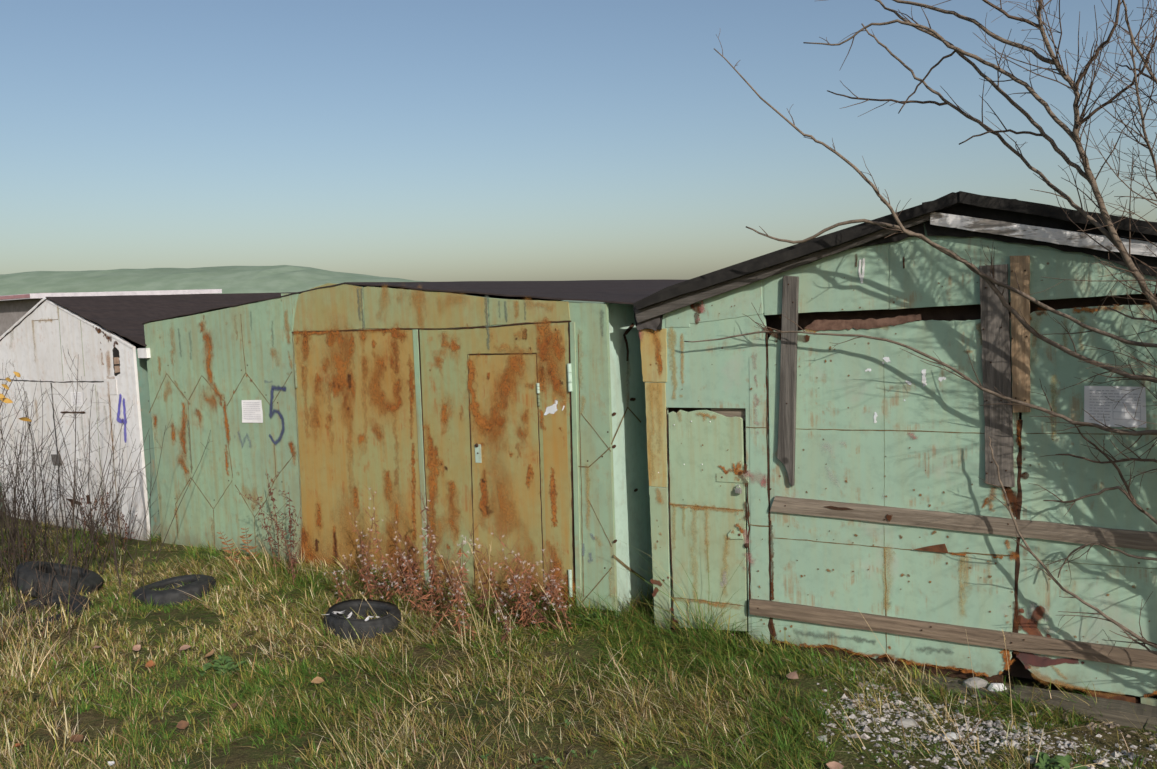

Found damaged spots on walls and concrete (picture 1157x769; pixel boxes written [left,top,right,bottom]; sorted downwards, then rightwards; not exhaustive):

rust [172,318,234,475]
rust [285,314,461,591]
rust [467,319,574,609]
rust [1005,591,1051,638]